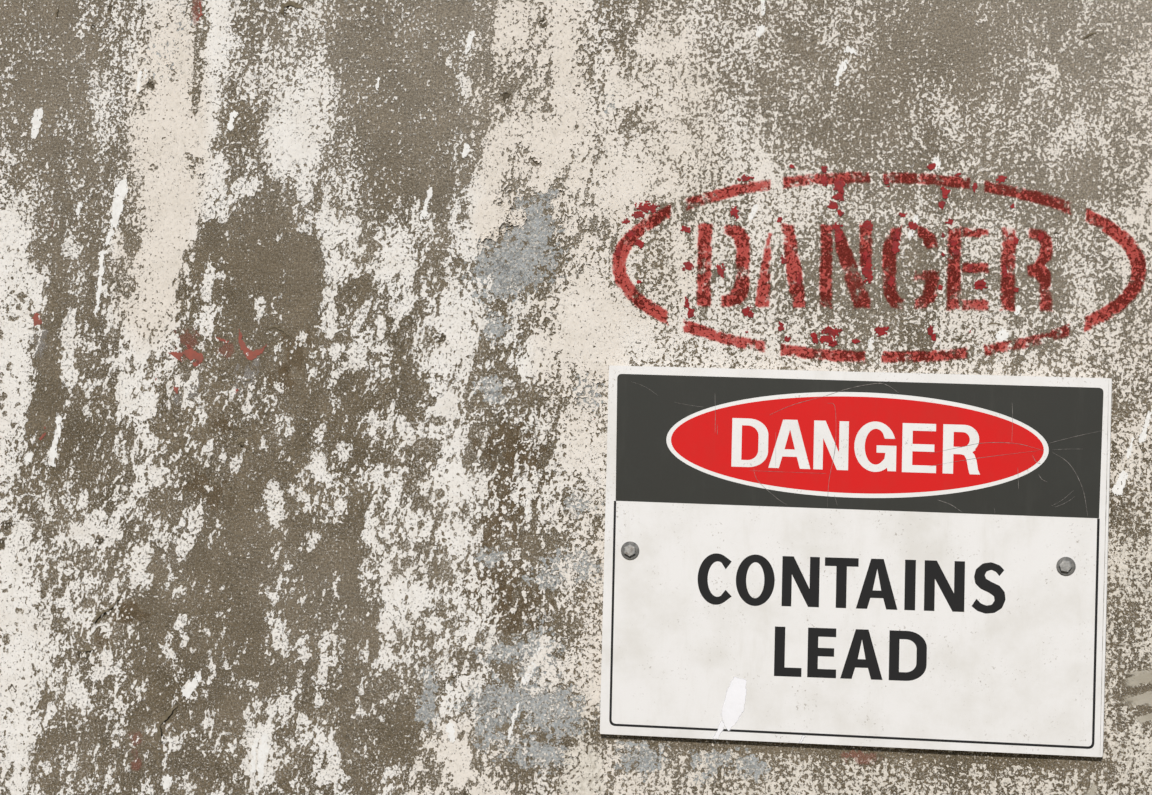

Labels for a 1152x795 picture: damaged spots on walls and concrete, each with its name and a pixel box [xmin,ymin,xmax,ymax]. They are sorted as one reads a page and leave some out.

peeling [388,92,450,160]
peeling [237,288,283,361]
peeling [132,552,355,795]